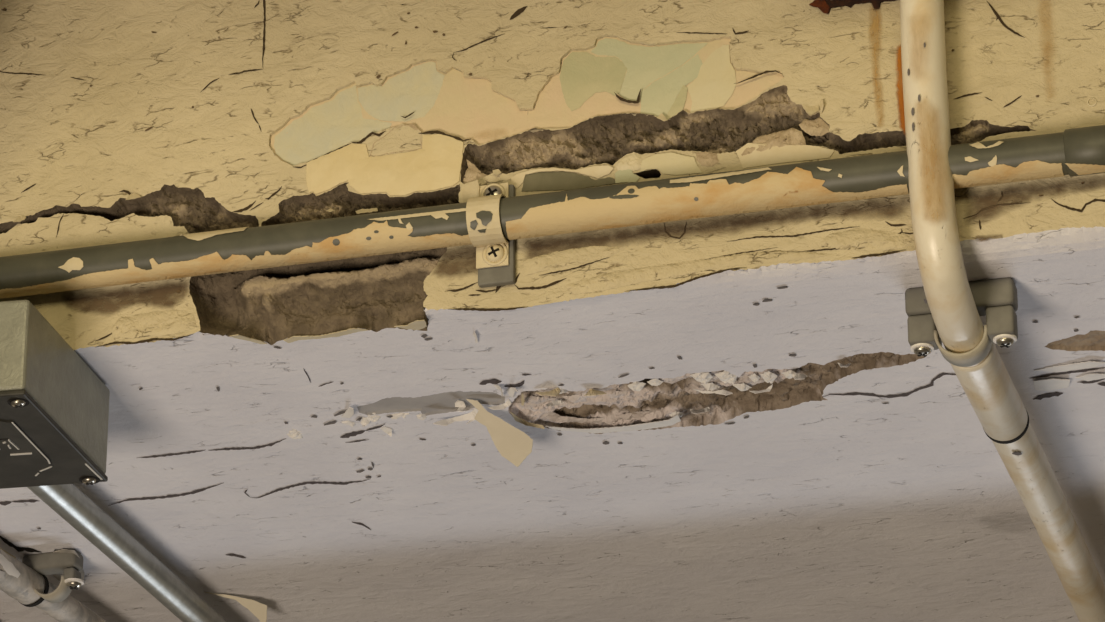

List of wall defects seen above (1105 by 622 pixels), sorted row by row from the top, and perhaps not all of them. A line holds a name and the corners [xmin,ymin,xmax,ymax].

crack [200,0,266,93]
spalling [0,37,920,234]
rust [809,0,896,121]
rust [897,46,905,133]
spalling [950,120,1036,145]
spalling [176,247,447,349]
crack [139,439,285,458]
spalling [356,352,925,467]
crack [823,373,956,398]
spalling [1033,317,1105,391]
crack [108,479,369,506]